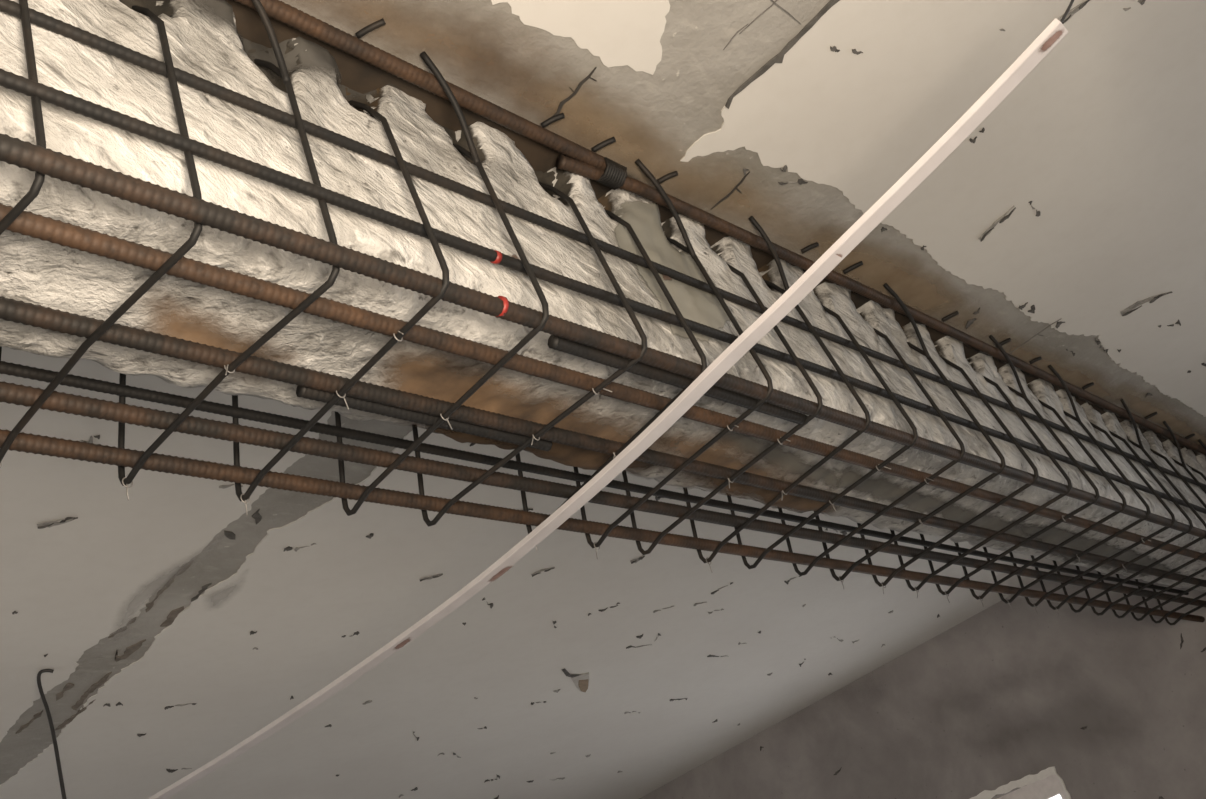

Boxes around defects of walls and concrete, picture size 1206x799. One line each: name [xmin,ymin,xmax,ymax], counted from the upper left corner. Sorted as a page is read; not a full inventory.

peeling [1058,0,1090,24]
spalling [725,0,840,109]
peeling [978,201,1041,242]
peeling [1121,291,1173,316]
corrosion [154,304,281,361]
peeling [37,517,78,529]
spalling [160,583,212,627]
spalling [55,559,193,730]
peeling [562,669,589,692]